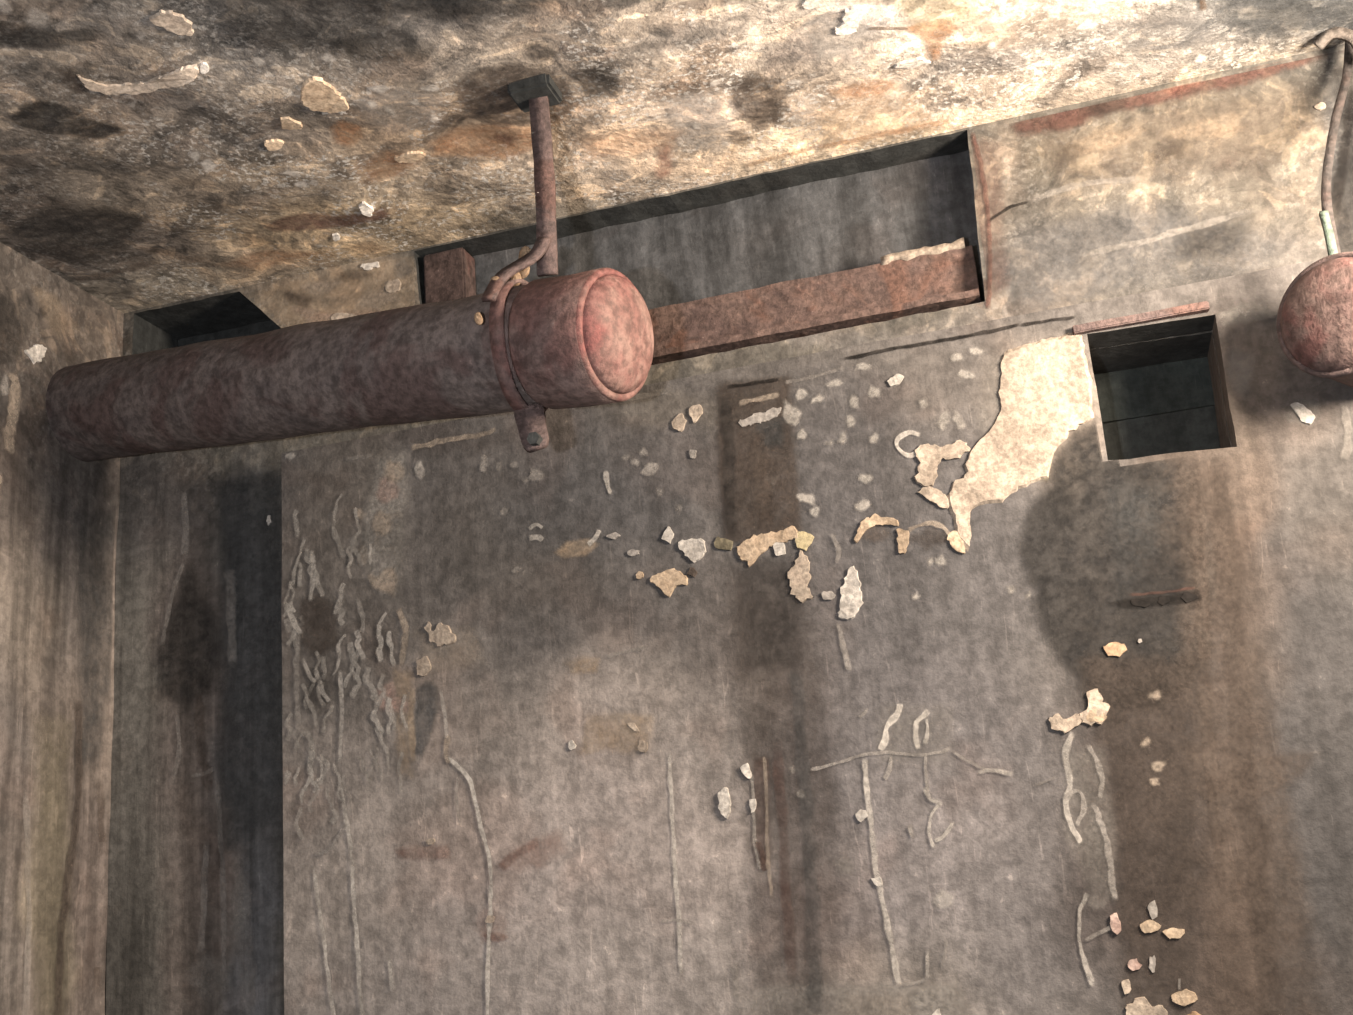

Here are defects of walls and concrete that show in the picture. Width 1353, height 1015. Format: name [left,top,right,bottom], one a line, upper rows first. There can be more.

leakage [191,151,216,171]
spalling [784,380,841,438]
spalling [829,374,904,444]
flaking render [854,333,1094,554]
spalling [798,494,818,514]
flaking render [561,530,621,554]
flaking render [627,526,863,669]
flaking render [1048,688,1110,734]
flaking render [1110,913,1121,935]
flaking render [1140,900,1185,939]
flaking render [1121,955,1201,1015]